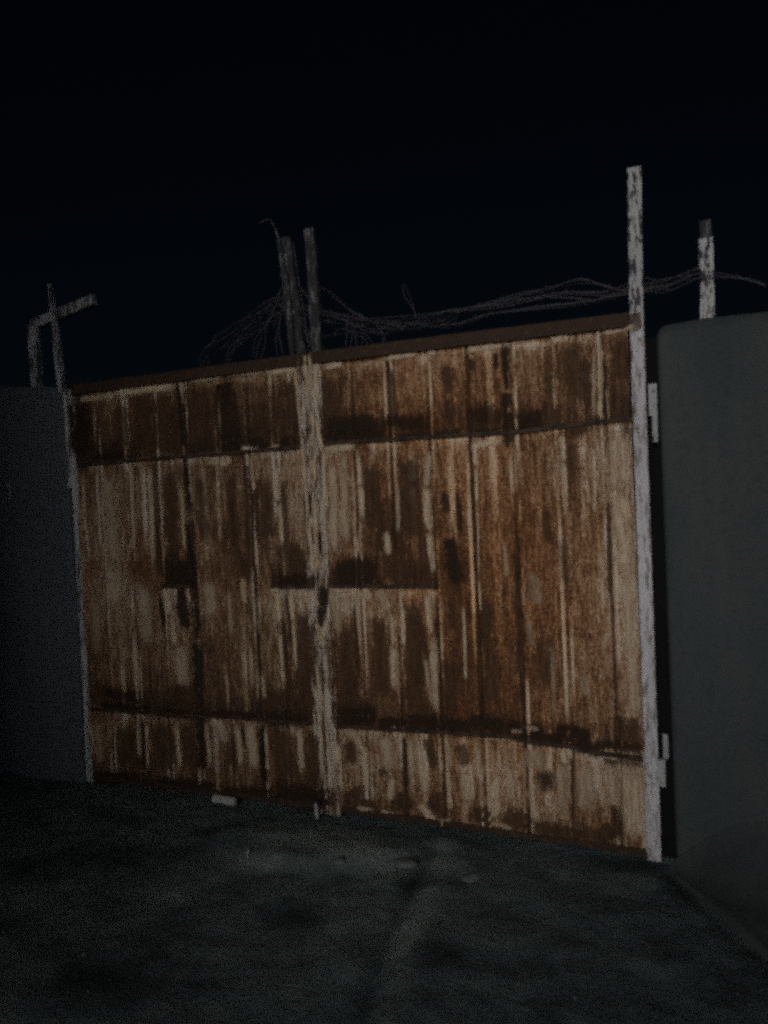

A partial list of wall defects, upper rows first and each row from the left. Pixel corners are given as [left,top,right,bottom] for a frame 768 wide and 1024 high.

corrosion [67,400,131,461]
corrosion [319,344,544,448]
corrosion [558,312,642,488]
corrosion [90,376,642,844]